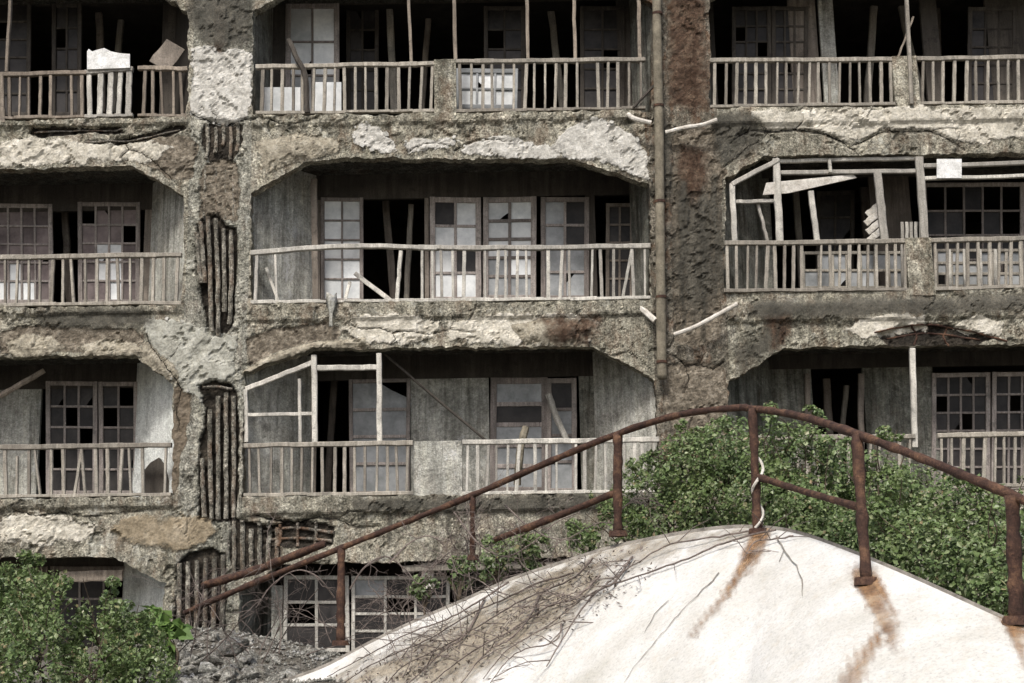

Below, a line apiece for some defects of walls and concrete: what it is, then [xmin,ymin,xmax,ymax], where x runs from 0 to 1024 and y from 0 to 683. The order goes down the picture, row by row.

corrosion [668,0,709,112]
peeling [352,117,650,180]
crack [724,121,965,167]
spalling [0,41,599,631]
spalling [844,313,1008,347]
corrosion [717,528,768,603]
corrosion [849,570,891,682]